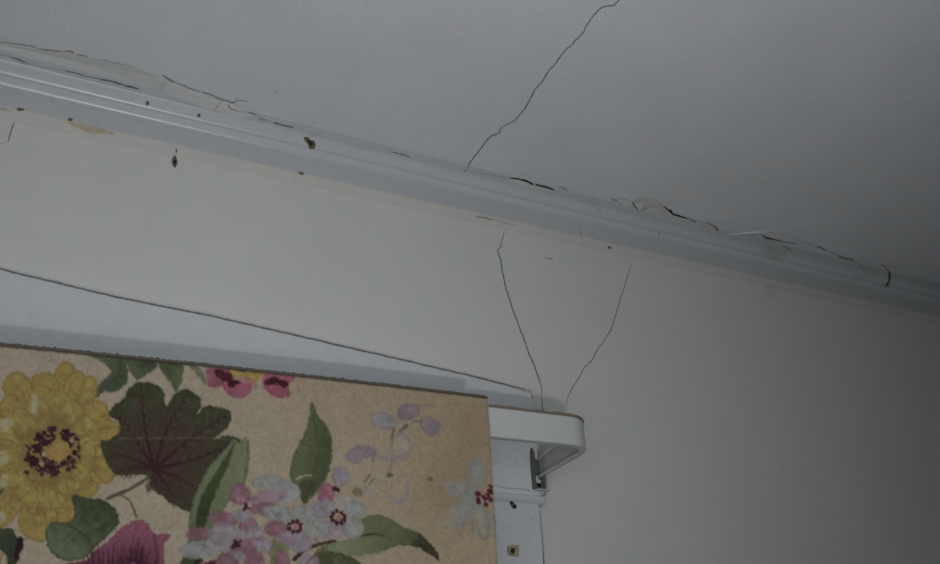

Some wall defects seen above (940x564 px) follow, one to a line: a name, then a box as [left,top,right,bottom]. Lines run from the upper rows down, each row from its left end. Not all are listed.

crack [464,0,619,171]